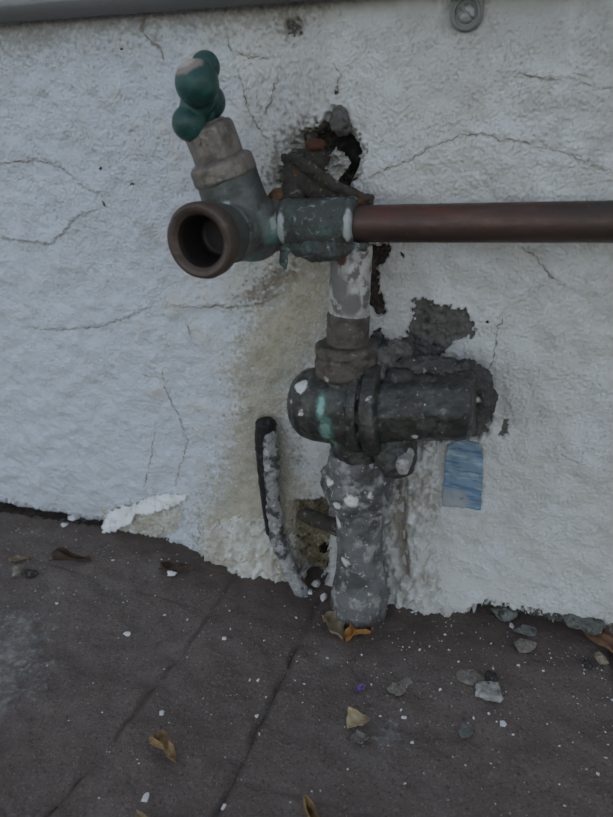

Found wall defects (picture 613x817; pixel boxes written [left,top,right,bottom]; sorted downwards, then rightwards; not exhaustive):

spalling [304,105,362,186]
spalling [370,328,389,347]
spalling [402,297,476,358]
crack [143,374,189,487]
leakage [197,257,329,570]
spalling [471,414,493,438]